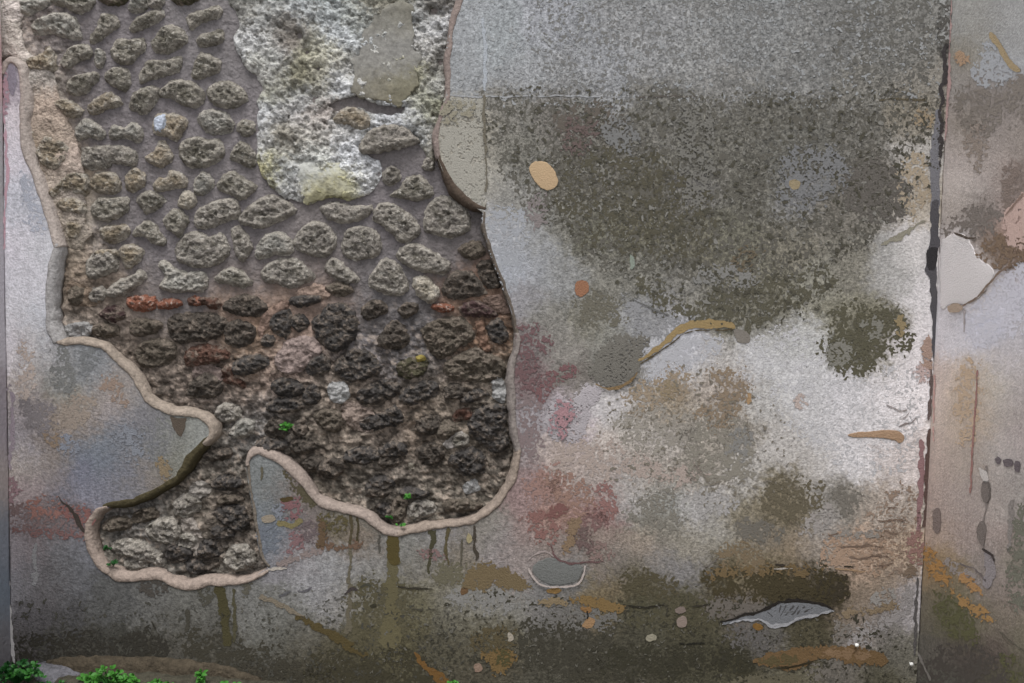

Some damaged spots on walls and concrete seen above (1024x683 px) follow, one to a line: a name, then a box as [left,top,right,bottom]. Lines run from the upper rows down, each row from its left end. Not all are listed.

damp [594,112,643,158]
damp [672,101,719,208]
damp [768,140,932,227]
damp [480,202,532,295]
damp [692,262,762,293]
damp [859,315,887,342]
damp [825,337,857,372]
spalling [170,416,186,436]
damp [349,515,359,545]
damp [427,527,472,574]
peeling [722,602,834,629]
rust [753,644,889,672]